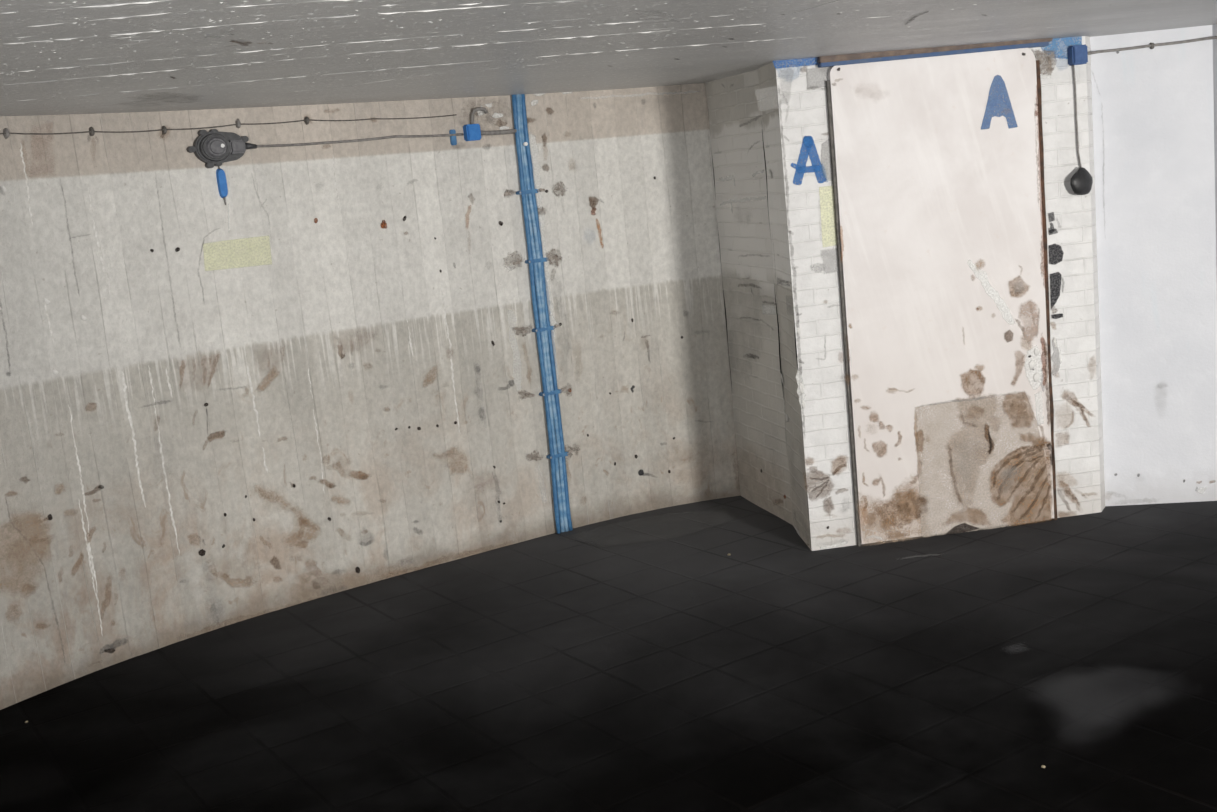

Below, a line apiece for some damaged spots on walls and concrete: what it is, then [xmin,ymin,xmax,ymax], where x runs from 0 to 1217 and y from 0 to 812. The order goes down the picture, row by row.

peeling [1025,212,1064,424]